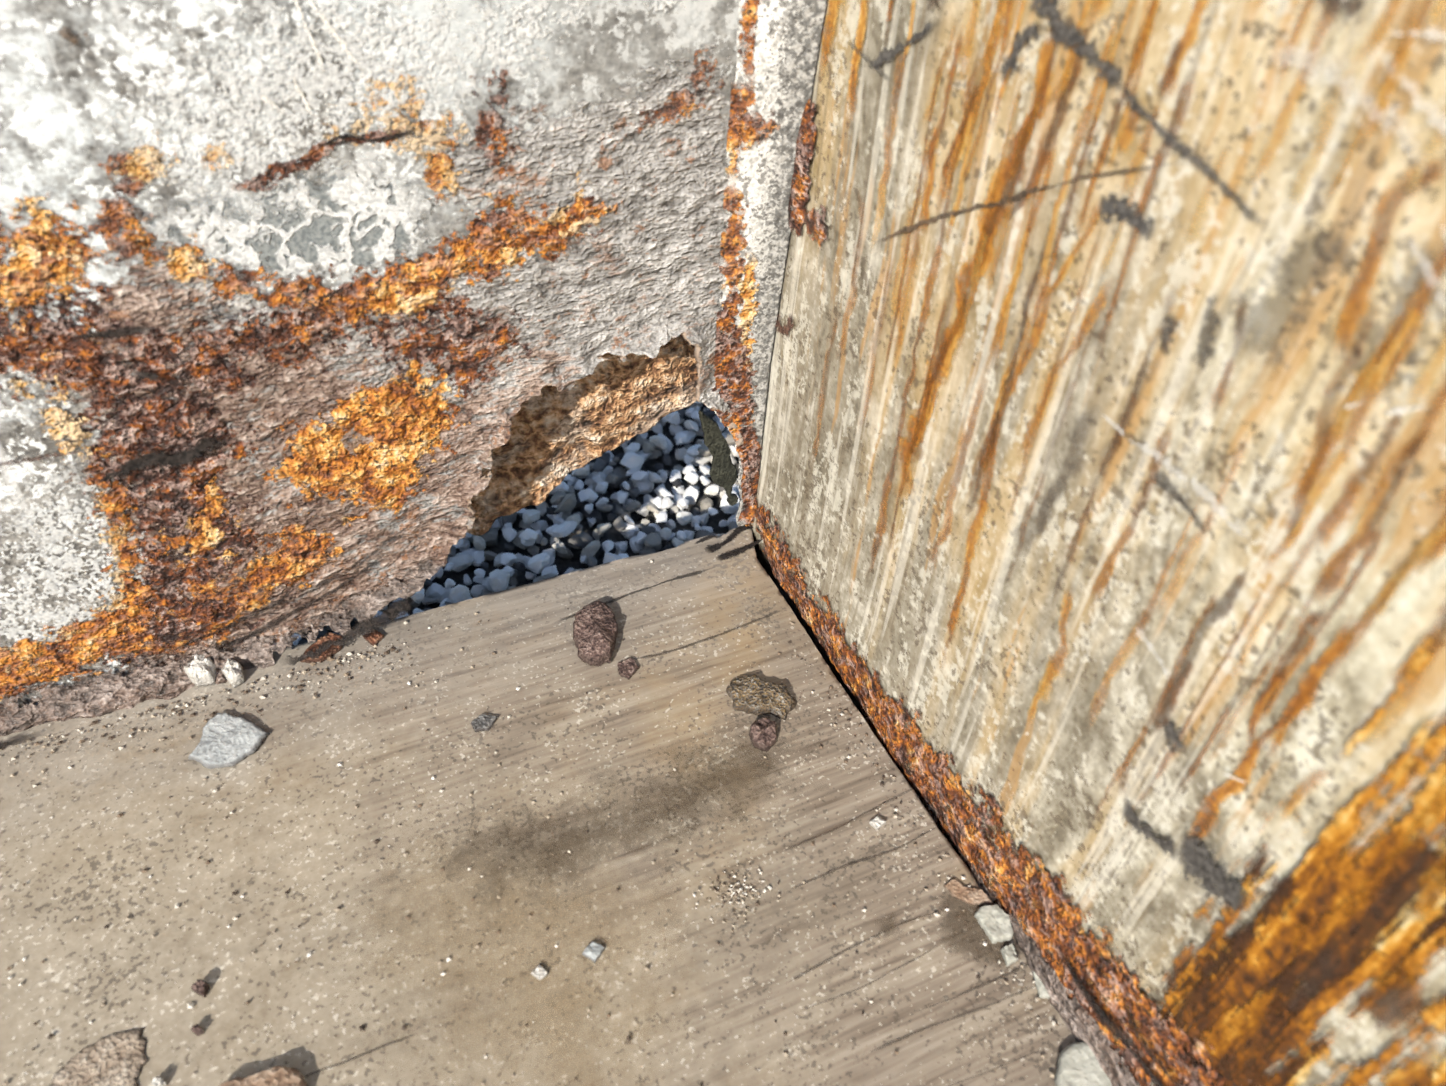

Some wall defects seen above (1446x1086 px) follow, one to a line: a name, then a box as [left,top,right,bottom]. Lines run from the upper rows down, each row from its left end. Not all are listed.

corrosion [0,69,623,701]
peeling [0,0,734,749]
corrosion [638,0,780,173]
corrosion [788,99,828,250]
corrosion [822,0,867,103]
corrosion [877,0,1208,634]
corrosion [1261,79,1304,166]
corrosion [1282,0,1332,67]
corrosion [1337,163,1440,342]
corrosion [1367,0,1429,126]
corrosion [573,601,640,680]
corrosion [710,190,1446,1086]